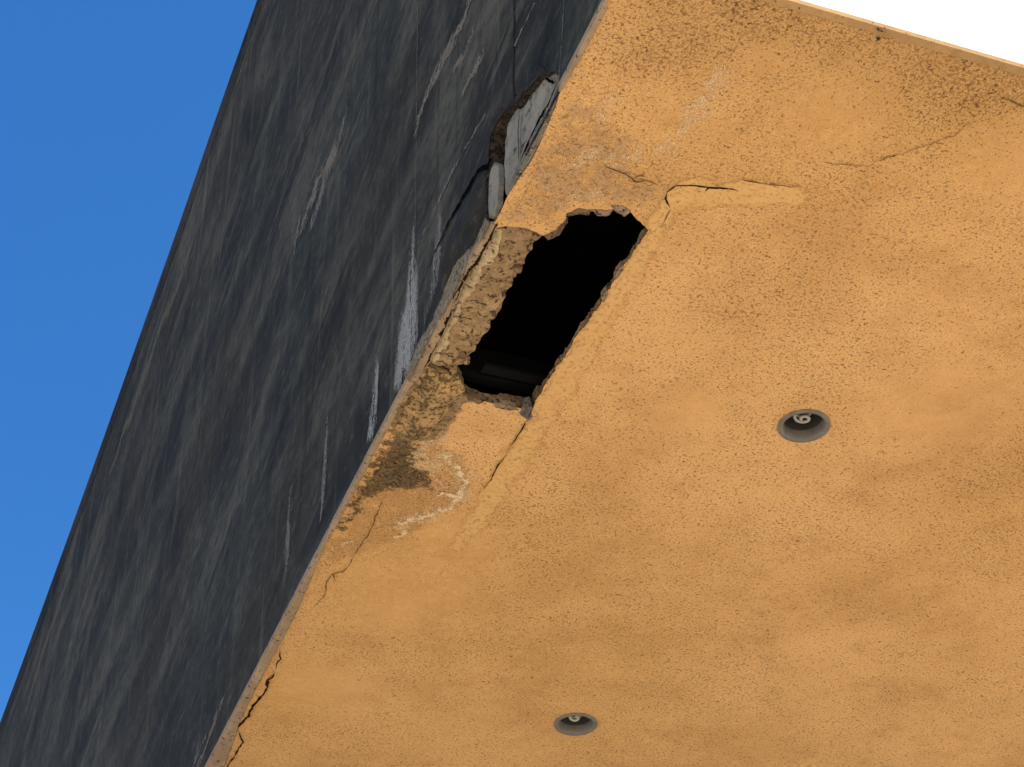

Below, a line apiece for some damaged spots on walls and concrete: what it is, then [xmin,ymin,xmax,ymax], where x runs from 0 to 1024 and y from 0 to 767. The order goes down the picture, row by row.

spalling [408,71,646,411]
crack [601,162,802,222]
leakage [320,357,480,563]
crack [479,420,529,494]
crack [306,485,389,616]
crack [227,649,281,767]